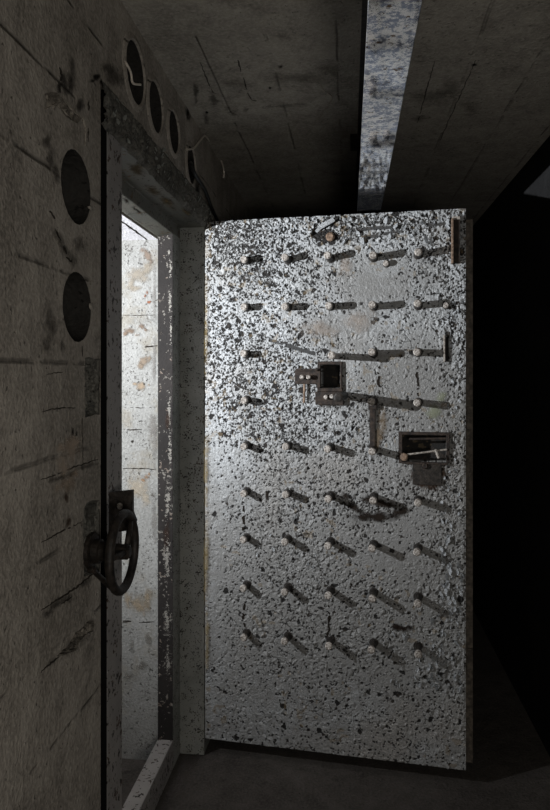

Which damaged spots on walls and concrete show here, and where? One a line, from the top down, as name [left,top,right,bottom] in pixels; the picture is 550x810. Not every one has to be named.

peeling [163,599,172,675]